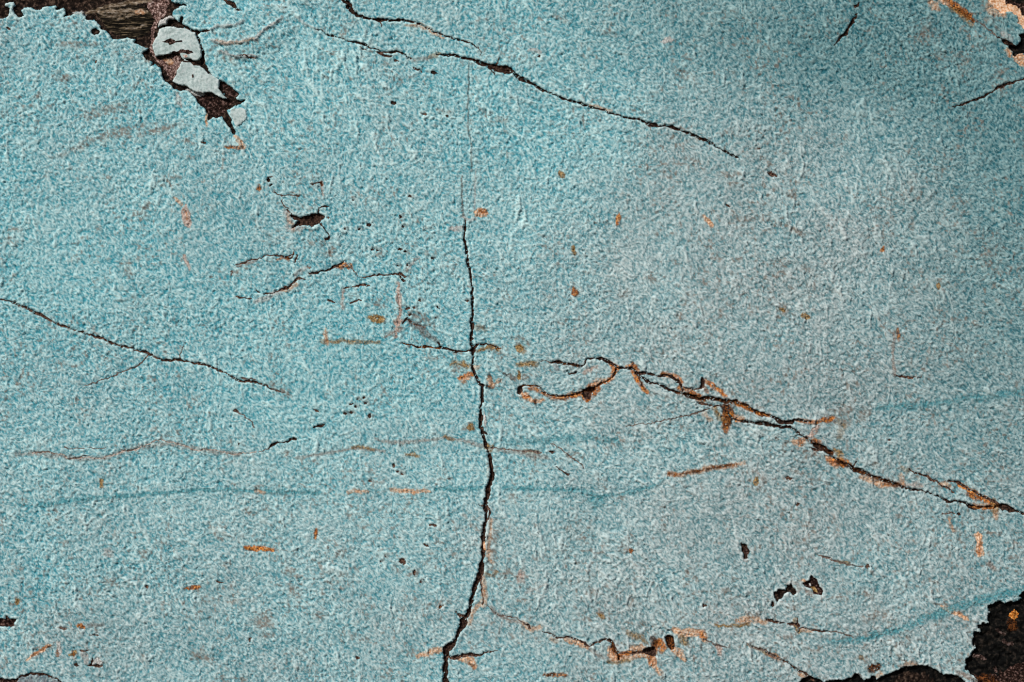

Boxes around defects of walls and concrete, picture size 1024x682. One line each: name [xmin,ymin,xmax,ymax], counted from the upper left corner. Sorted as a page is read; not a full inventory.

flaking render [0,0,246,149]
crack [315,0,739,158]
spalling [281,199,330,240]
crack [0,299,285,393]
crack [400,178,646,682]
corrosion [486,344,649,404]
corrosion [660,372,770,433]
crack [517,357,1024,528]
corrosion [792,417,904,487]
corrosion [564,627,722,674]
peeling [771,575,823,607]
flaking render [800,591,1024,682]